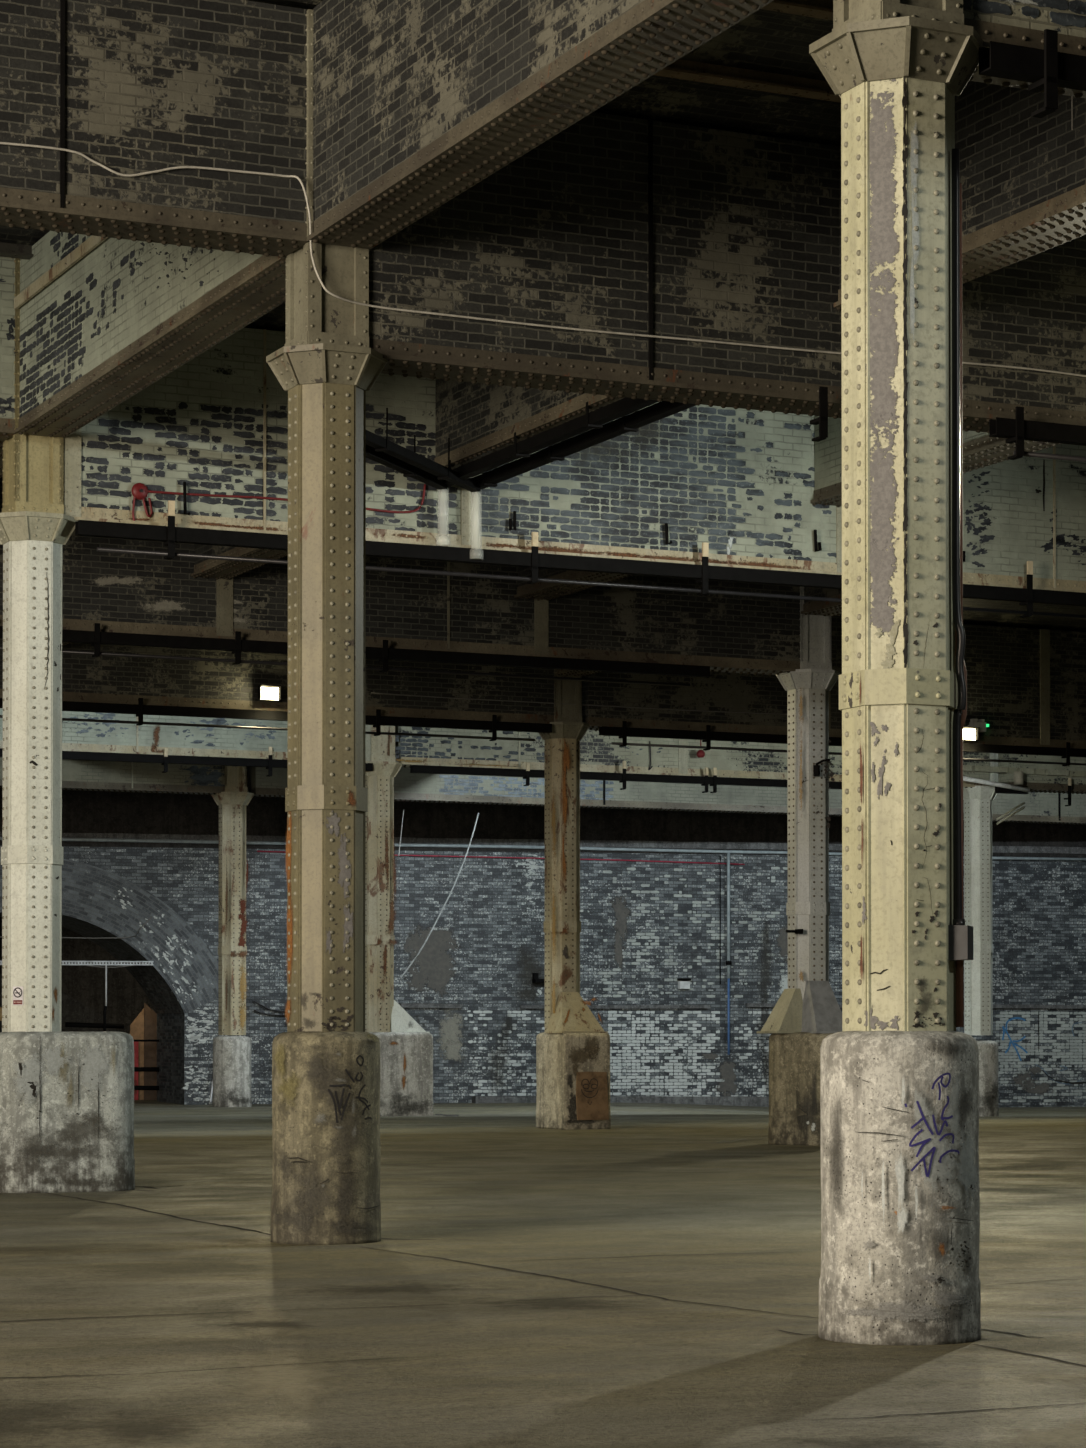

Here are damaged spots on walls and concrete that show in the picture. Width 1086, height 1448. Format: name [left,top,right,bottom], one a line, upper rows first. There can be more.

peeling [50,232,86,268]
peeling [865,77,920,669]
peeling [965,471,995,567]
peeling [1040,509,1086,565]
corrosion [551,739,570,958]
corrosion [225,860,249,1030]
damp [13,1045,115,1104]
damp [19,1113,107,1162]
damp [43,1178,109,1186]